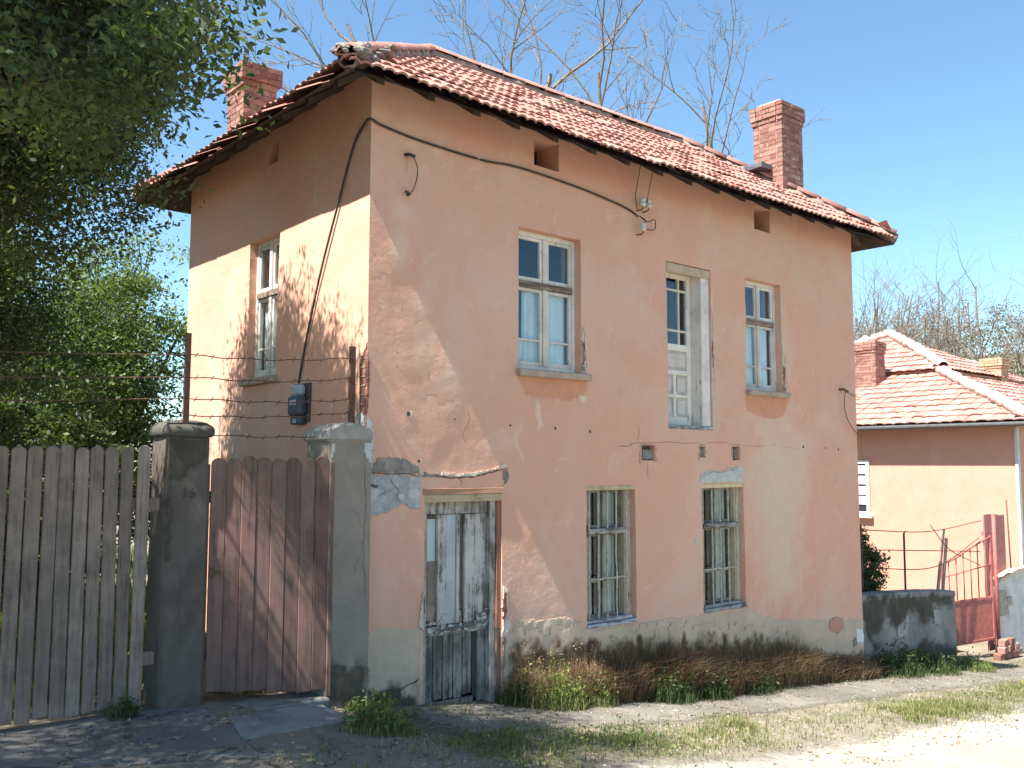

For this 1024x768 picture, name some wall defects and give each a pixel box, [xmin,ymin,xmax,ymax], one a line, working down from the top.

water stain [516,375,590,434]
water stain [743,392,790,419]
peeling [364,443,441,488]
crack [355,382,509,597]
water stain [816,592,953,665]